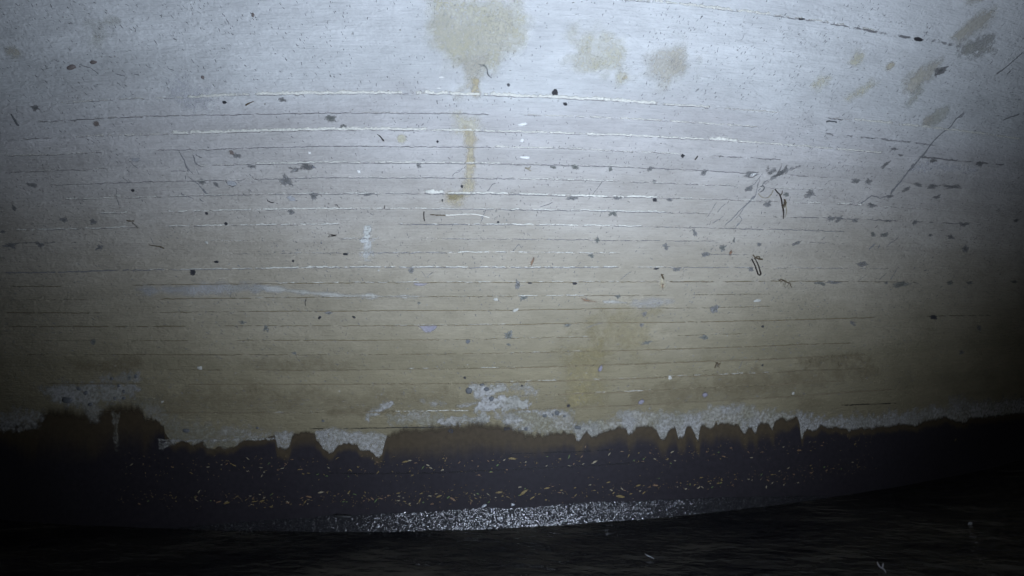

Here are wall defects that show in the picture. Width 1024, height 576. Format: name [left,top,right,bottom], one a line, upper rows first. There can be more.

crack [861,113,964,204]
leakage [0,407,1024,529]